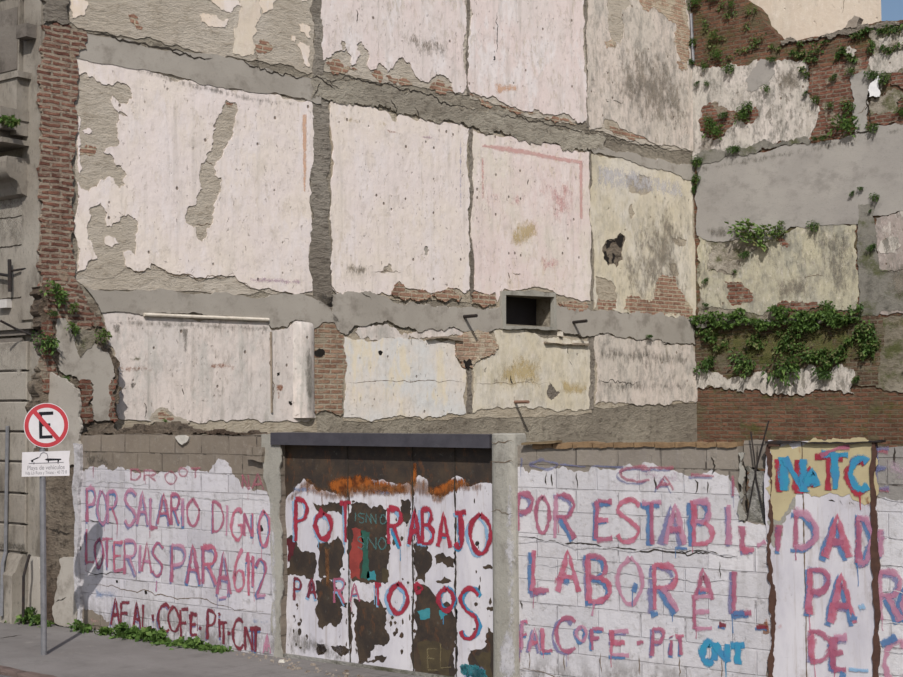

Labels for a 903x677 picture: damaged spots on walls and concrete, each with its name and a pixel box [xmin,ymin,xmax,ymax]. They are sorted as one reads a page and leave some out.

flaking render [255,39,273,54]
flaking render [326,41,357,75]
flaking render [604,0,690,71]
flaking render [74,72,132,191]
flaking render [698,101,759,140]
flaking render [185,101,238,241]
flaking render [83,203,138,279]
spalling [602,234,625,267]
flaking render [558,263,693,318]
corrosion [291,463,481,501]
peeling [287,499,458,677]
peeling [468,628,493,677]